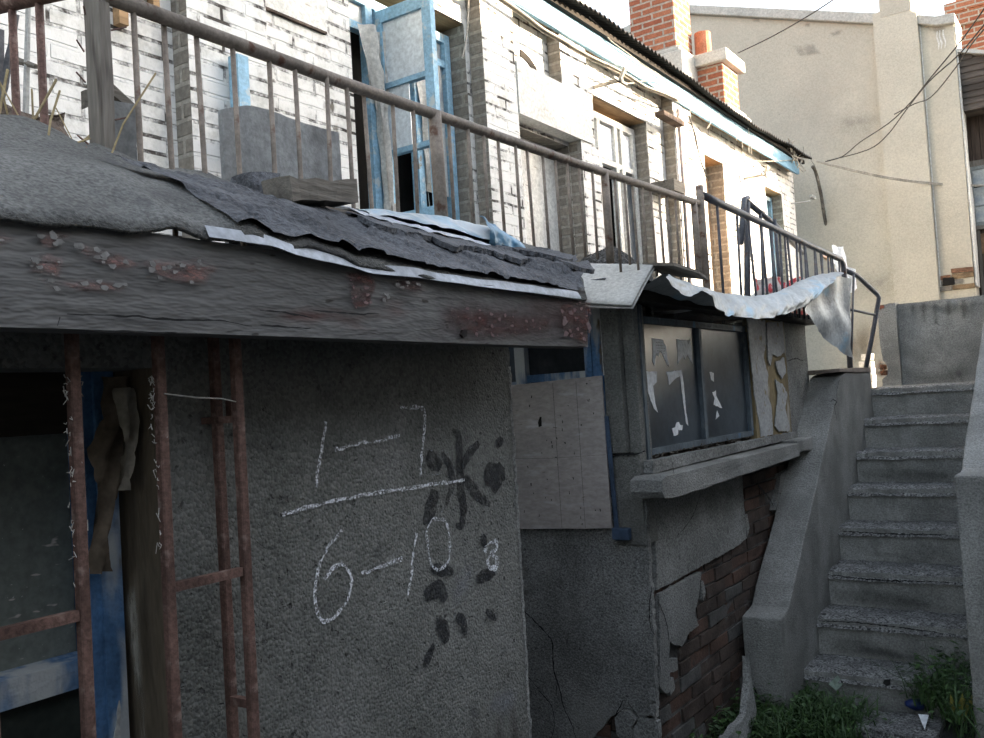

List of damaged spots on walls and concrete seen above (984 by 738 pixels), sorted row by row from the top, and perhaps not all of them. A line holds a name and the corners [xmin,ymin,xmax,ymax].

peeling [746,317,790,437]
spalling [596,460,789,738]
crack [525,612,576,738]